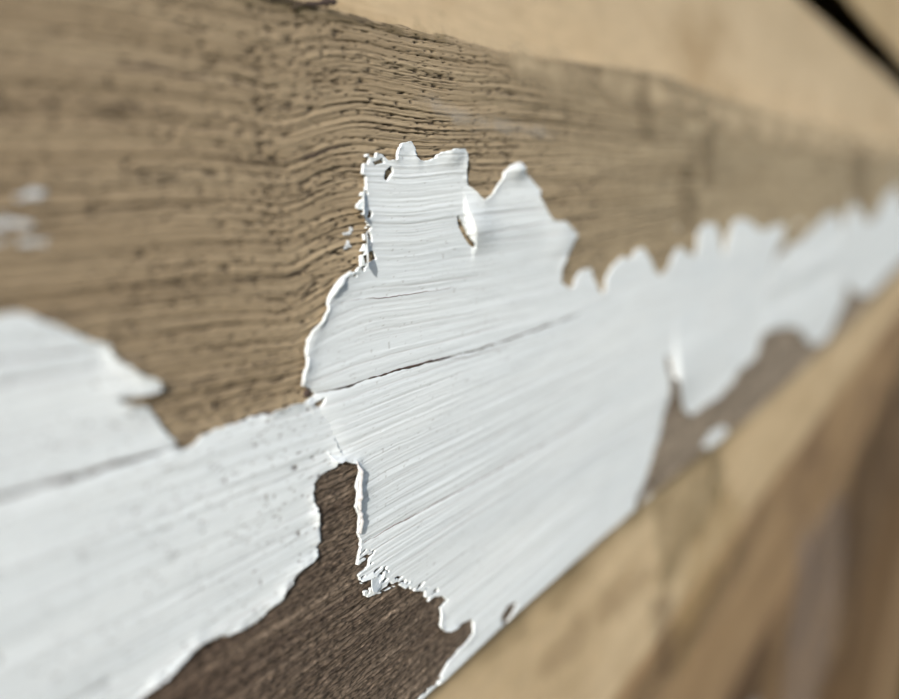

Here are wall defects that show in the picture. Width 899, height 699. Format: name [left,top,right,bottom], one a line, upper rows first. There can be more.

crack [0,315,578,499]
peeling [0,141,899,699]